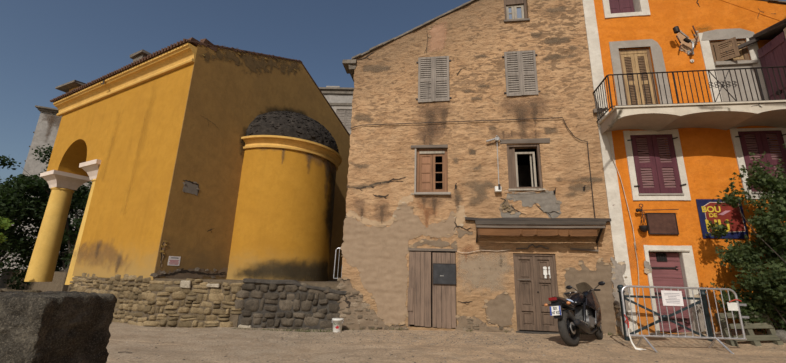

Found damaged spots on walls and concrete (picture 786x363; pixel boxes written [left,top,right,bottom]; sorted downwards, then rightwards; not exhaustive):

crack [347,177,405,199]
spalling [499,190,562,218]
damp [239,262,328,281]
peeling [336,193,473,330]